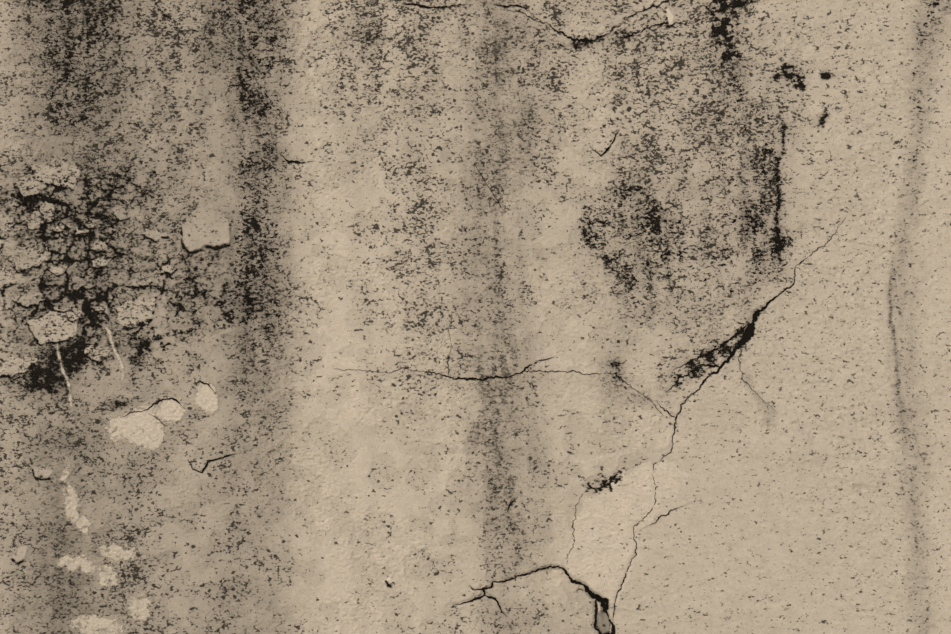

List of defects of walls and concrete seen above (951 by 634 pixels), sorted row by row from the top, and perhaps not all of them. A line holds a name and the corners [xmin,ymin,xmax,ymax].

spalling [0,158,176,383]
leakage [0,0,299,418]
crack [402,2,466,10]
leakage [455,0,552,584]
crack [333,218,846,634]
crack [494,0,691,42]
leakage [557,28,641,51]
leakage [571,0,806,408]